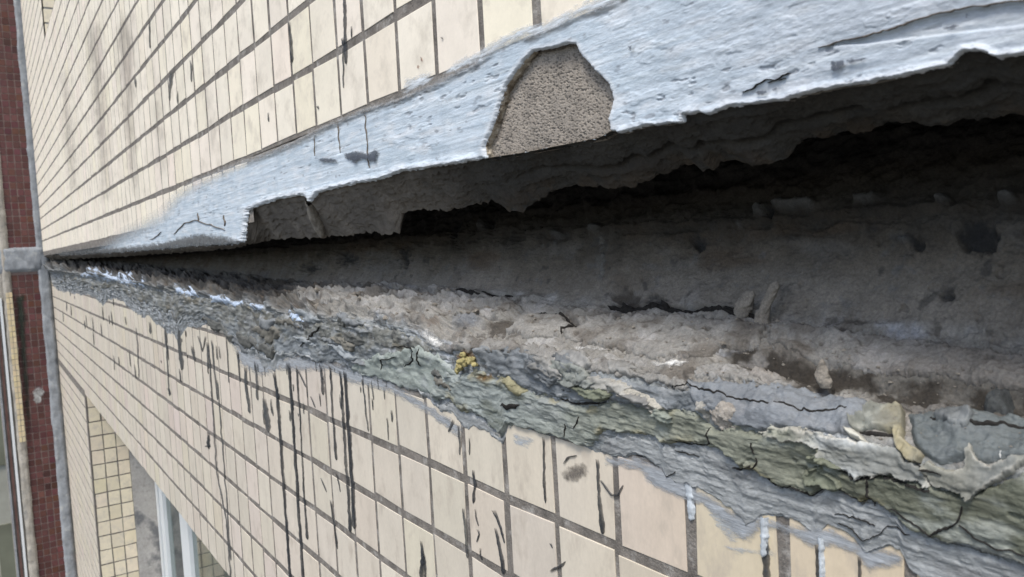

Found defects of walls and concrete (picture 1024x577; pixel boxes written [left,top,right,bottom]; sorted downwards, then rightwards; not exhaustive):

water stain [341,0,353,87]
spalling [486,44,617,161]
crack [152,213,226,239]
water stain [84,297,387,577]
water stain [419,543,427,577]
water stain [462,472,482,560]
water stain [493,512,506,574]
water stain [564,455,623,534]
crack [672,381,847,412]
crack [732,443,1024,557]
peeling [758,400,1024,502]
crack [970,419,1024,429]